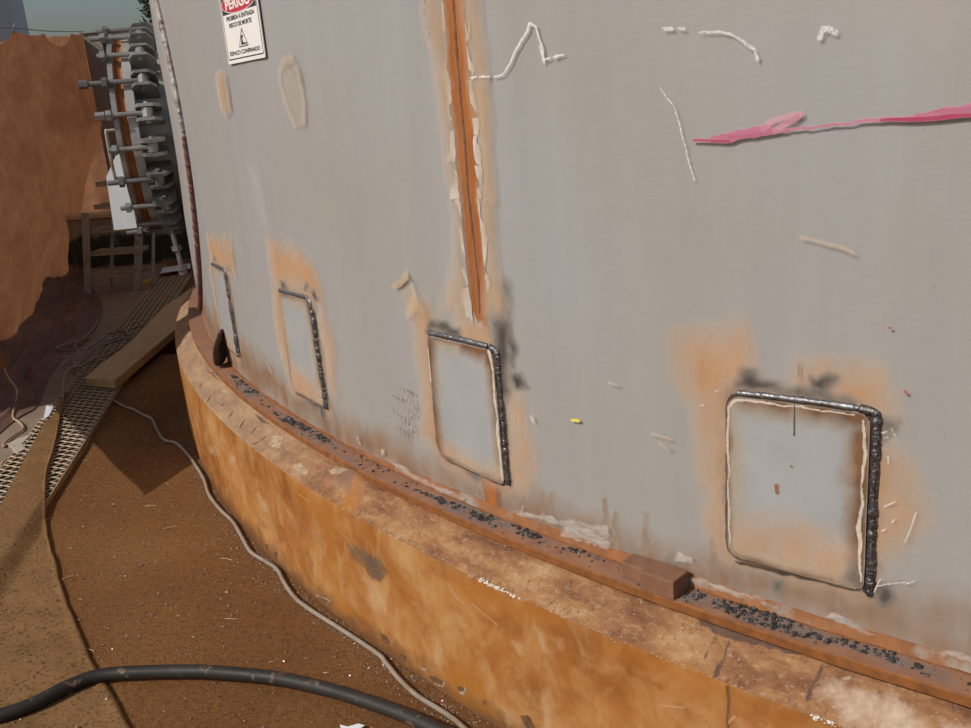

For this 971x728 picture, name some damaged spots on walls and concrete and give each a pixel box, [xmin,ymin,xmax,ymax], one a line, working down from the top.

peeling [444,61,473,325]
rust [424,0,502,332]
peeling [465,23,491,290]